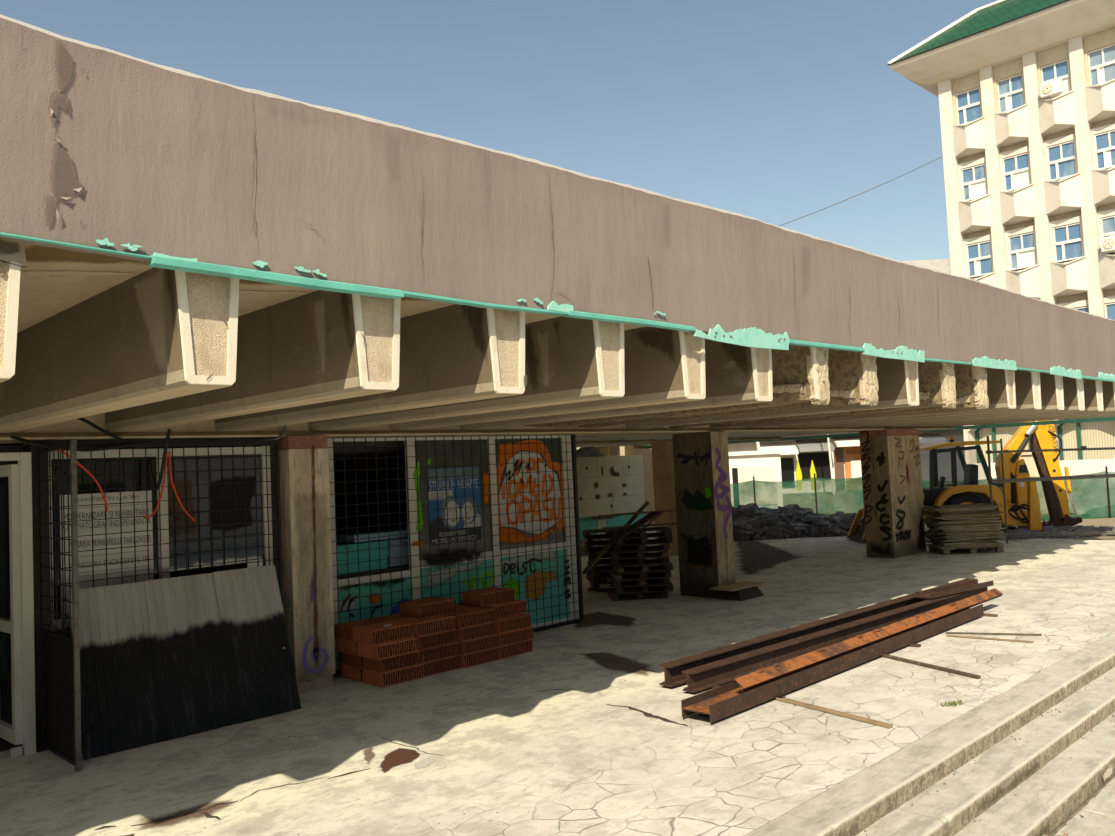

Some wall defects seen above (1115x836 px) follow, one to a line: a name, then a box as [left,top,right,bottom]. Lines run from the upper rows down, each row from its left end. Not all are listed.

peeling [45,41,86,226]
peeling [694,324,789,350]
spalling [540,343,1017,427]
crack [95,768,371,830]